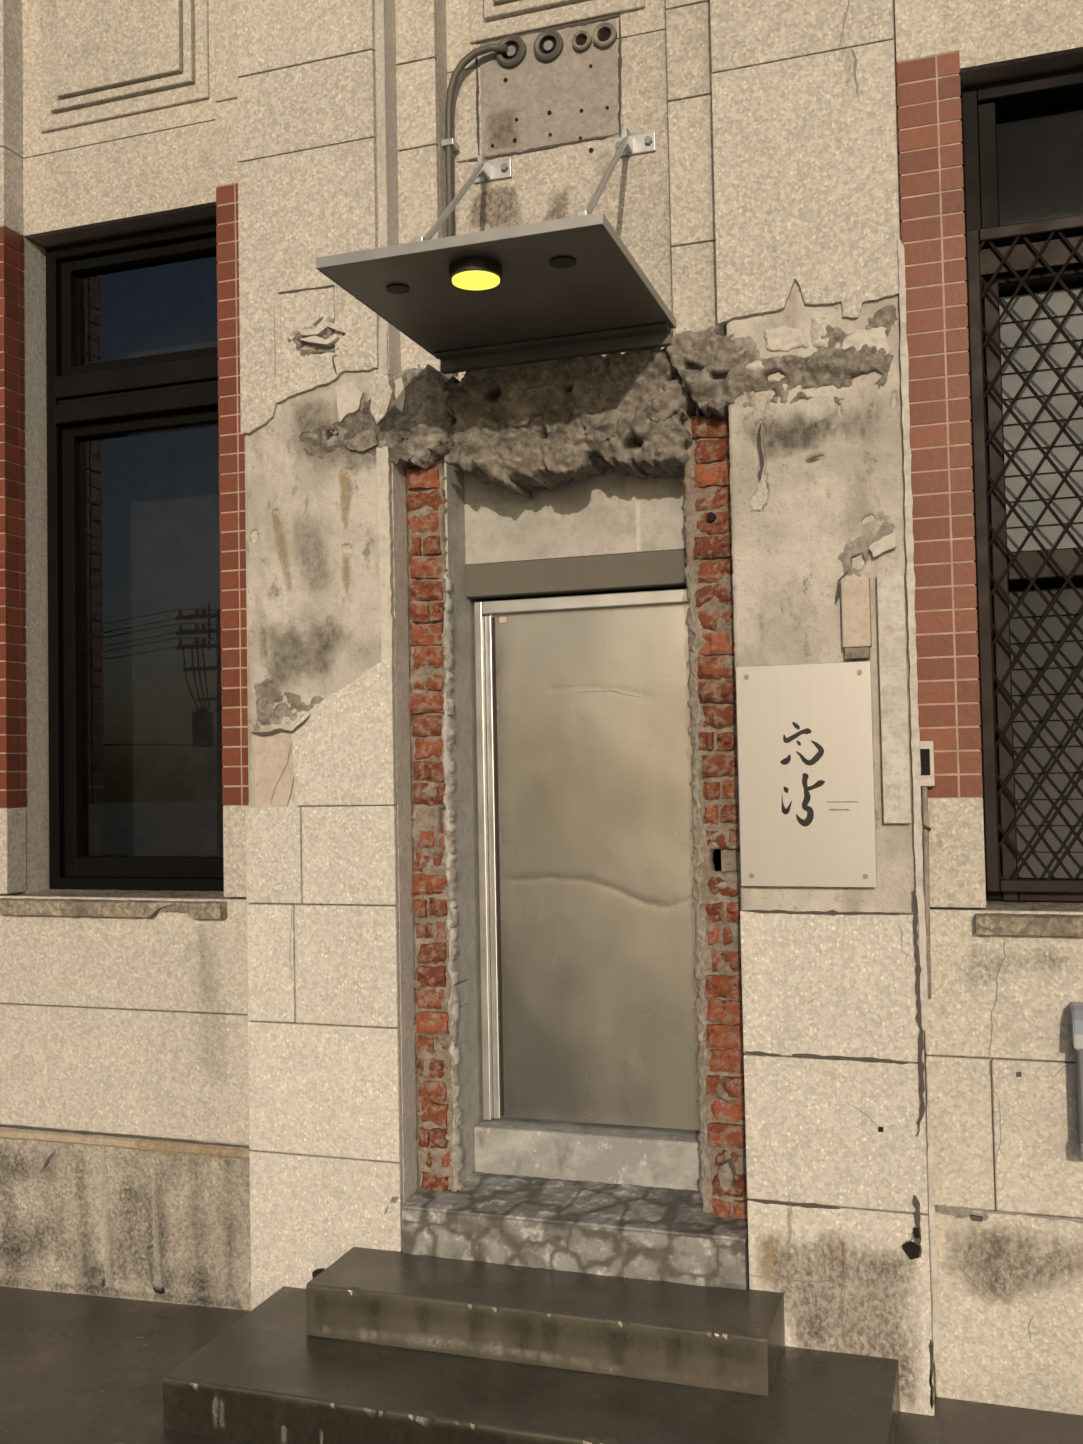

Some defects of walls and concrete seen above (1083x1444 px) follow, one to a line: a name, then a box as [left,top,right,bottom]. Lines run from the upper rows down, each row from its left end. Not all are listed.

crack [839,0,859,97]
spalling [245,286,469,1192]
spalling [666,280,925,1218]
damp [964,1235,1070,1295]